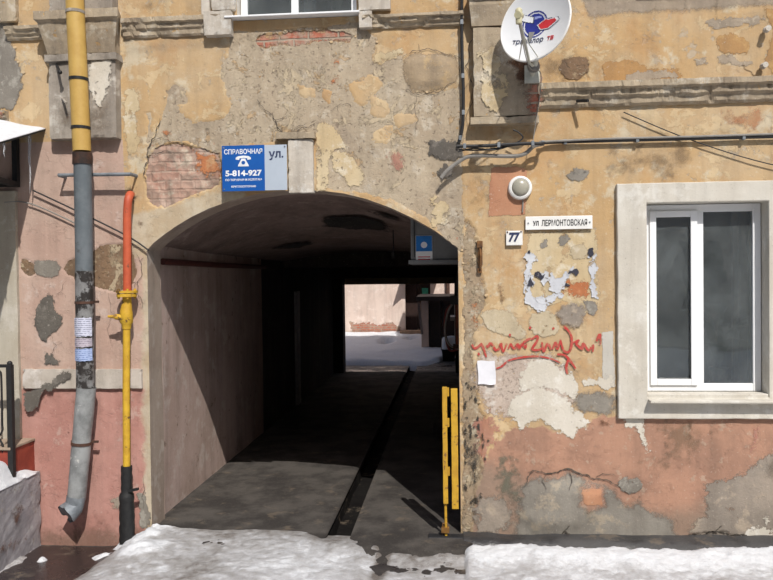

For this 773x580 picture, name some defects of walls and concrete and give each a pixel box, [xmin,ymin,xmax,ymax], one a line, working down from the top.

peeling [88,59,113,107]
flaking render [21,259,35,276]
flaking render [64,258,75,279]
flaking render [93,244,137,292]
flaking render [121,22,603,533]
crack [523,468,619,490]
flaking render [745,516,773,536]